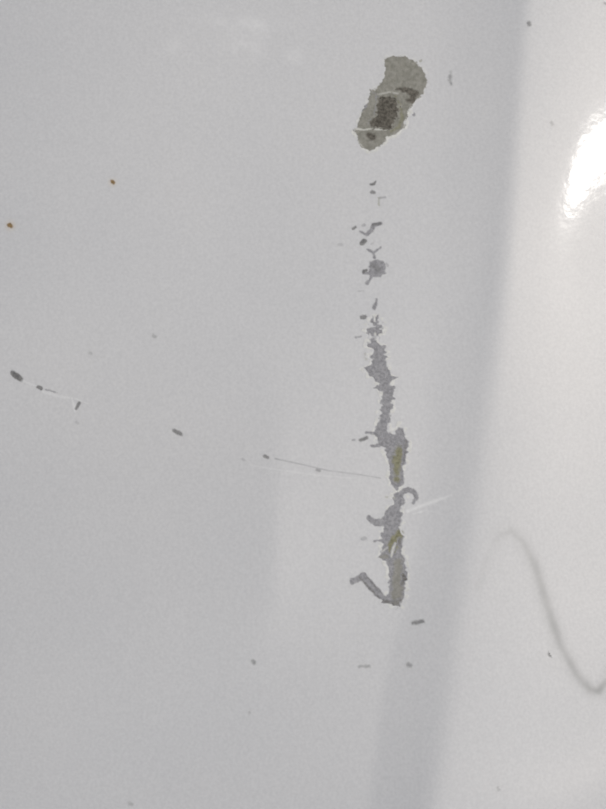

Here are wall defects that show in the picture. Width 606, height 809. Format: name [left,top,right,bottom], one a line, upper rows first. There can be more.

peeling [350,53,430,155]
peeling [351,221,383,247]
peeling [361,262,382,274]
peeling [350,310,413,609]
peeling [410,618,426,626]